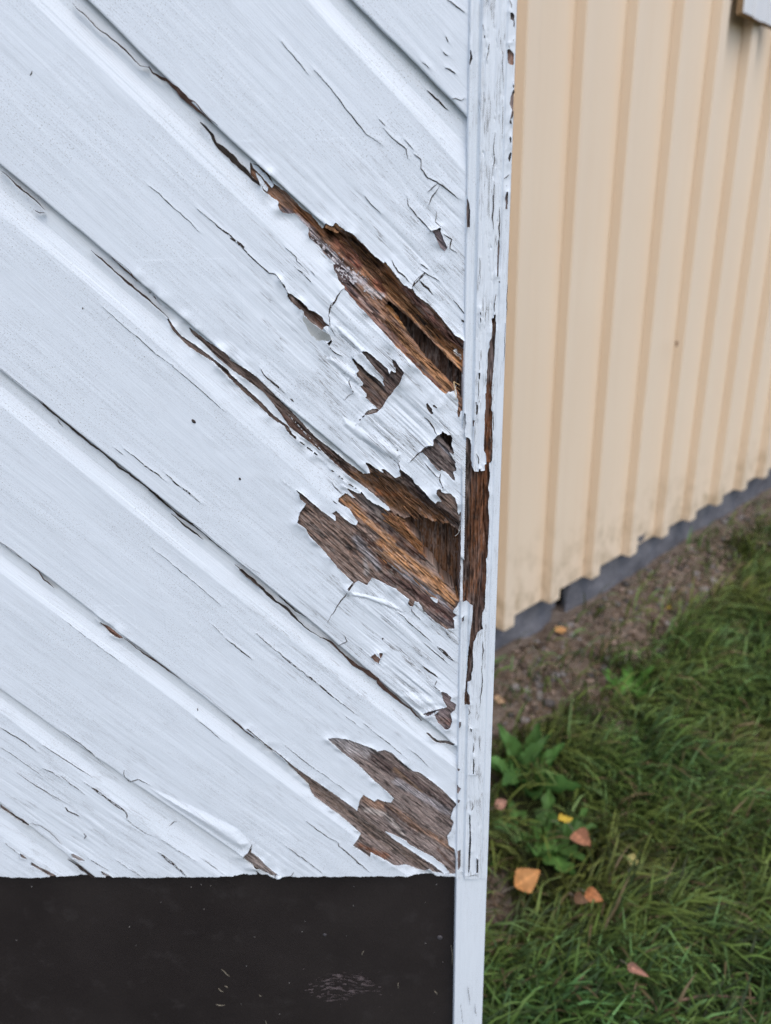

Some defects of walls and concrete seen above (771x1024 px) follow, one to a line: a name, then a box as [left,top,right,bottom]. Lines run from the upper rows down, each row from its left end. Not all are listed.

crack [423,37,462,110]
crack [281,41,458,253]
peeling [432,228,447,251]
peeling [283,284,331,341]
crack [392,261,464,322]
spalling [168,318,464,629]
peeling [248,729,478,874]